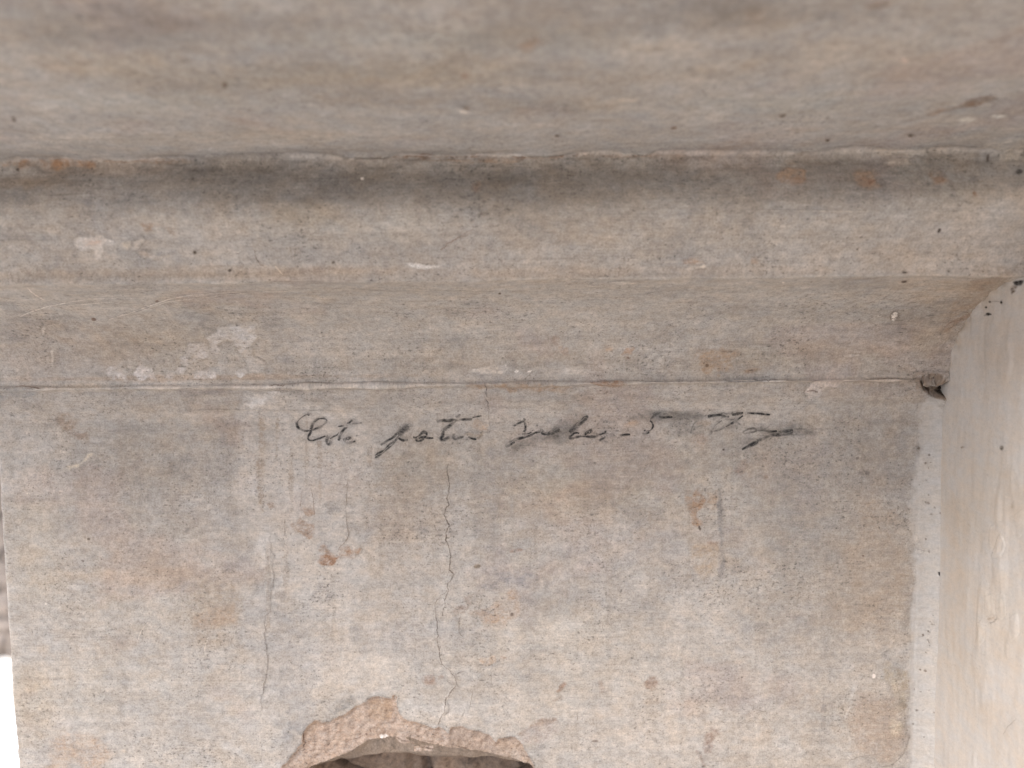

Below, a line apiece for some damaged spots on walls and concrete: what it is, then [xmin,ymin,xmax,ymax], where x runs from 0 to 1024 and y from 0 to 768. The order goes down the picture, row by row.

crack [433,463,494,725]
spalling [280,694,535,768]